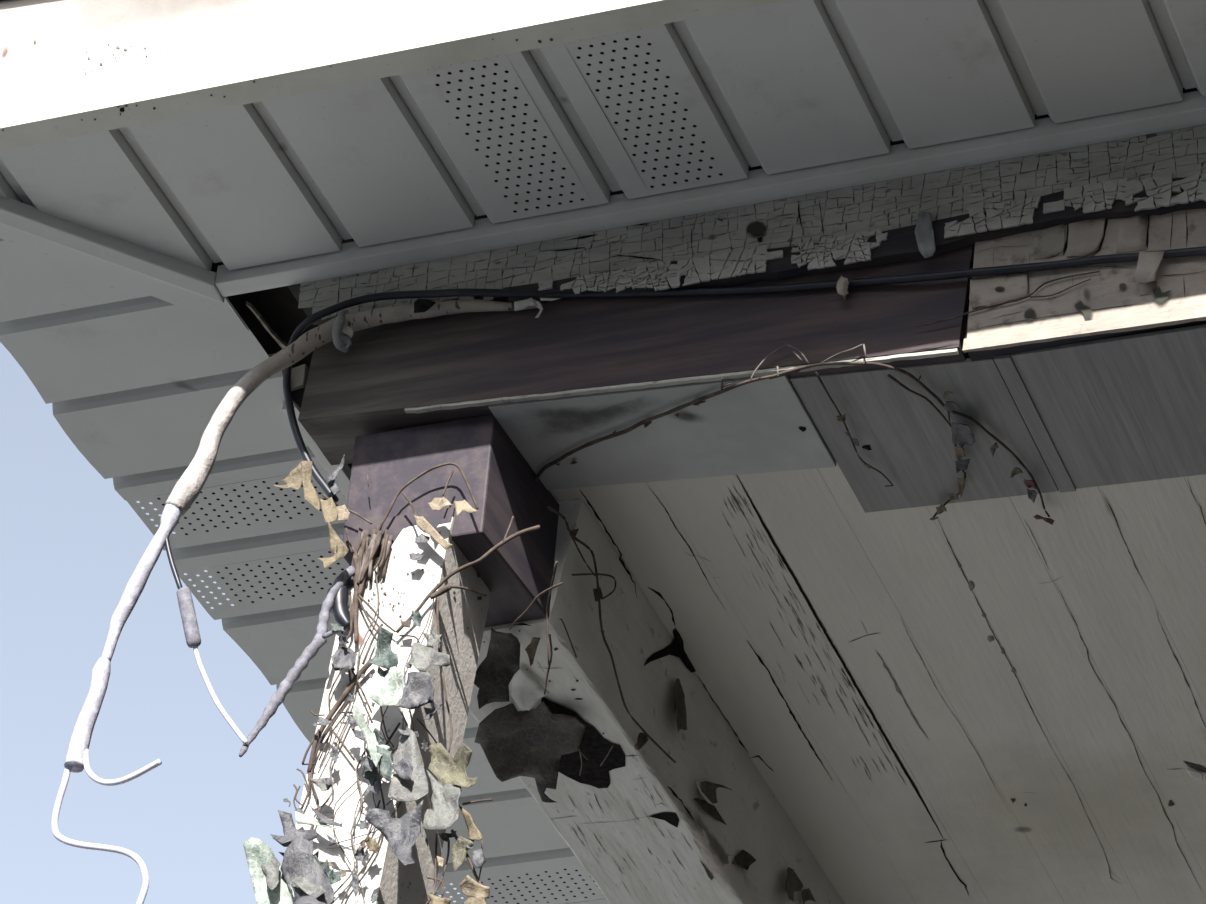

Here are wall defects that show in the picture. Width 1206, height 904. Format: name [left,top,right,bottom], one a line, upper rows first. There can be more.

peeling [944,173,1206,259]
peeling [414,299,436,313]
peeling [514,229,888,318]
peeling [969,272,1028,309]
crack [747,641,832,779]
crack [848,621,1028,815]
crack [938,520,1125,884]
crack [1026,523,1197,882]
crack [940,841,968,893]